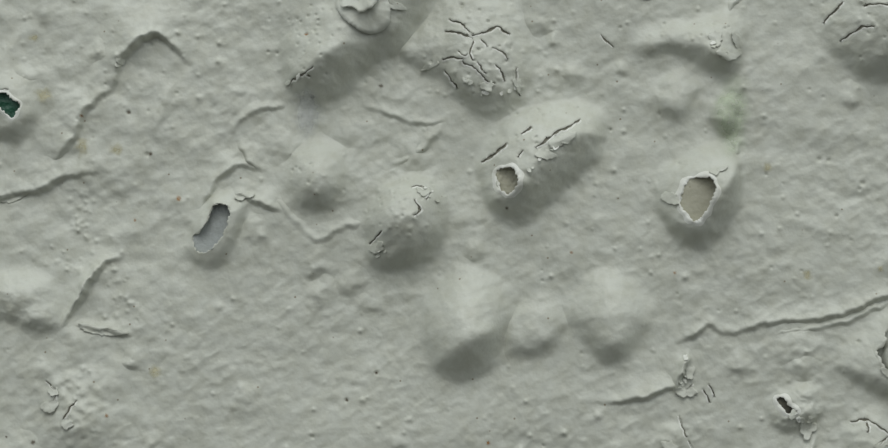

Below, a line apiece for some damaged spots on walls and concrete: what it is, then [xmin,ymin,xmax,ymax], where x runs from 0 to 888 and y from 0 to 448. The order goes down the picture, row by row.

peeling [0,0,208,213]
peeling [184,90,361,249]
crack [441,17,521,96]
crack [481,118,581,164]
crack [821,1,888,42]
peeling [589,276,888,416]